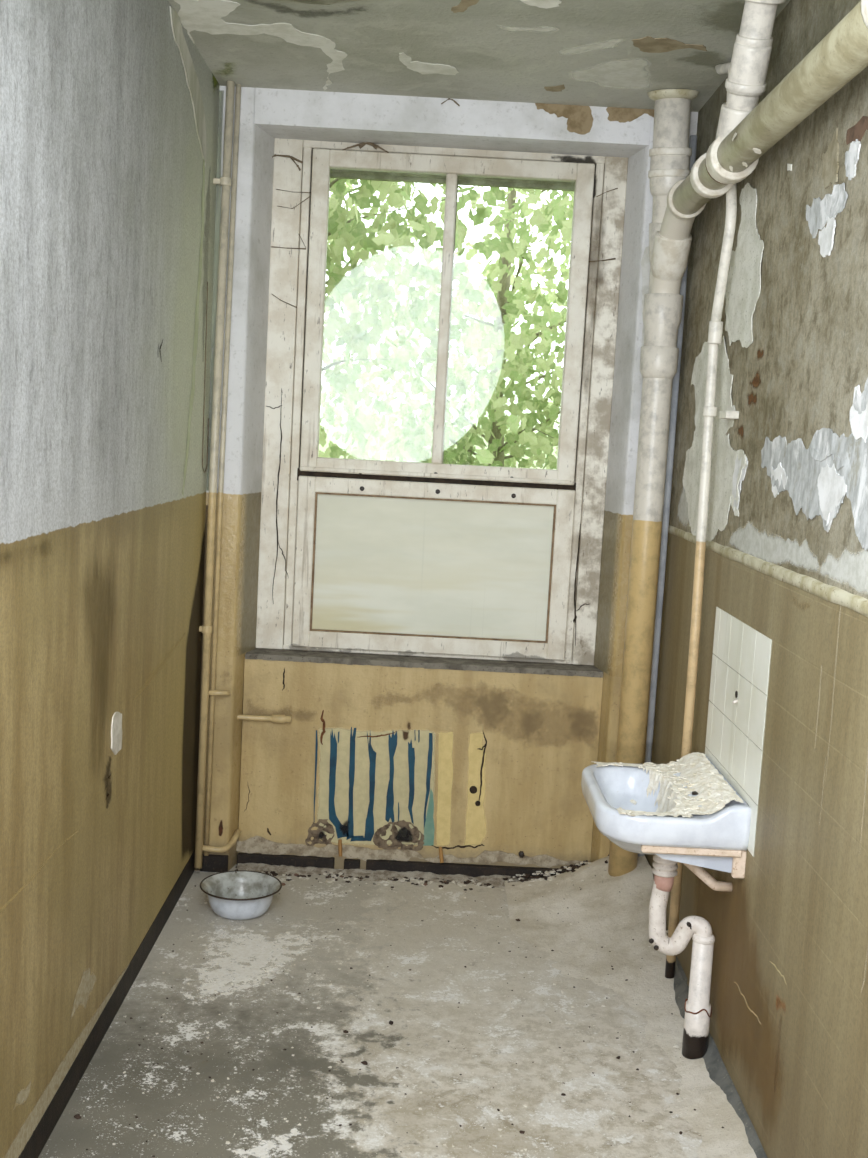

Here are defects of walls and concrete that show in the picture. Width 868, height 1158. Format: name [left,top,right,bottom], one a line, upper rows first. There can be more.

peeling [520,0,562,9]
peeling [399,52,459,75]
peeling [631,36,707,53]
peeling [535,84,654,135]
spalling [806,116,868,257]
peeling [683,183,868,551]
crack [267,388,288,604]